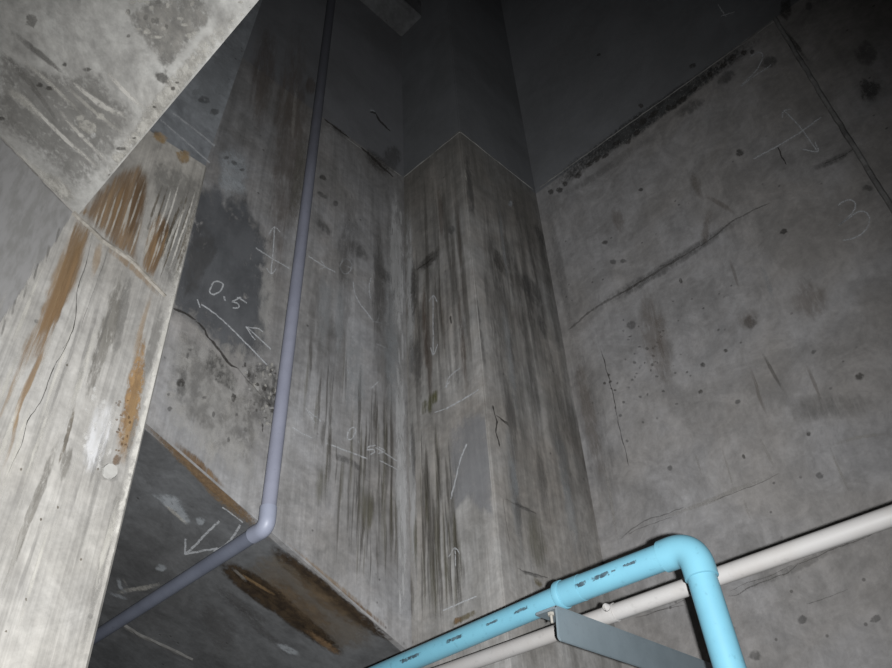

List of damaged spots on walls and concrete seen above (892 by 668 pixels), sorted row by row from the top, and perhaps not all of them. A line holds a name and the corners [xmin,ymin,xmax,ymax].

mould [567,50,744,177]
crack [9,245,91,471]
corrosion [13,168,169,434]
corrosion [113,345,145,465]
crack [173,308,239,369]
damp [390,206,417,607]
crack [492,406,509,447]
crack [602,354,629,466]